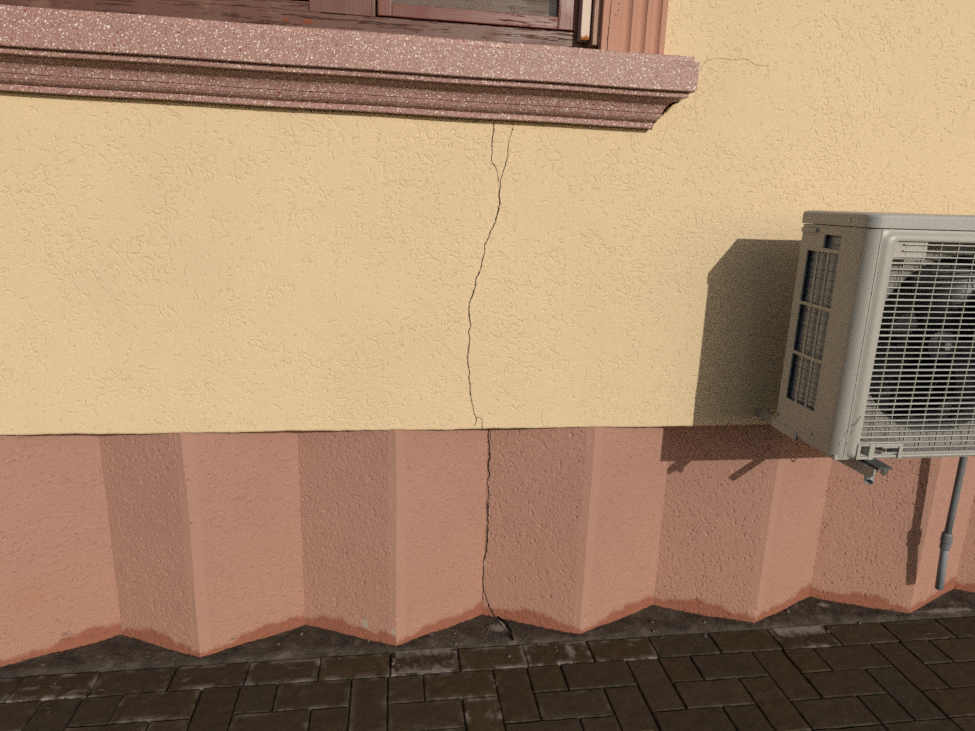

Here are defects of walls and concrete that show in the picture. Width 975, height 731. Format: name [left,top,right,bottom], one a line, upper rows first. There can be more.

crack [467,122,514,618]